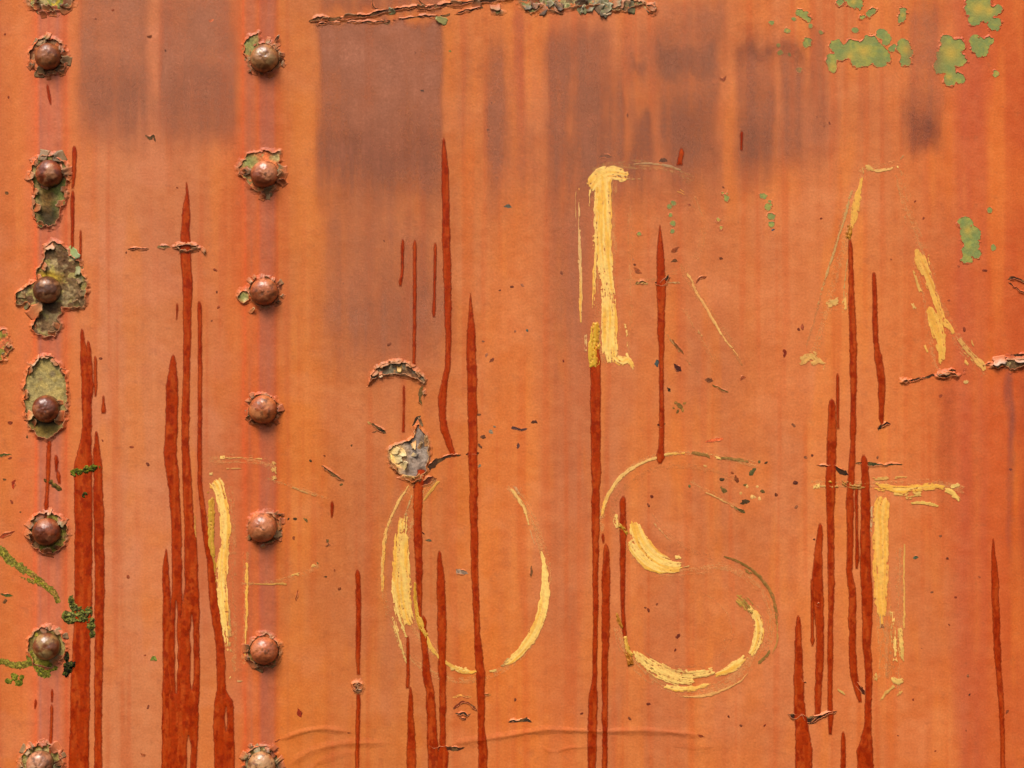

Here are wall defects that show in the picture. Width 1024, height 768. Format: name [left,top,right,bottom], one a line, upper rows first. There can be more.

peeling [491,0,659,19]
peeling [768,0,915,73]
peeling [932,0,1004,88]
peeling [8,149,91,443]
rust [69,329,106,768]
rust [161,183,235,768]
peeling [366,343,433,486]
rust [406,469,448,768]
rust [432,139,488,768]
rust [587,345,627,768]
rust [793,240,874,768]
peeling [955,216,996,272]